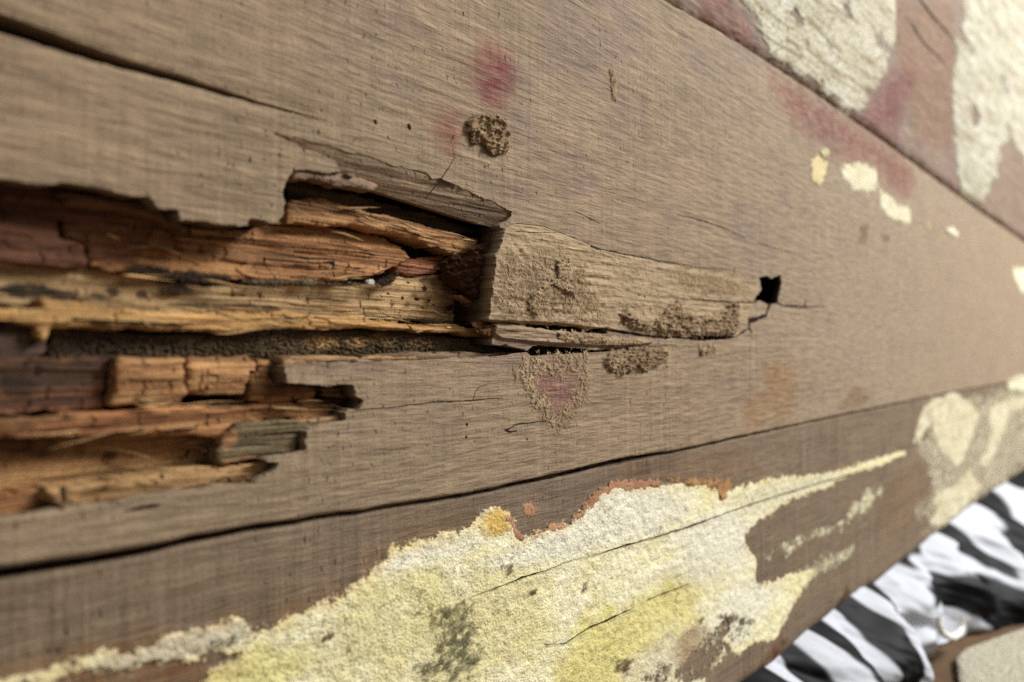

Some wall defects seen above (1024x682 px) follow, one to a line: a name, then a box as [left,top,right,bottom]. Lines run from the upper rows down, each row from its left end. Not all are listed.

spalling [0,133,516,514]
crack [486,298,825,355]
crack [470,471,860,598]
crack [545,583,689,645]